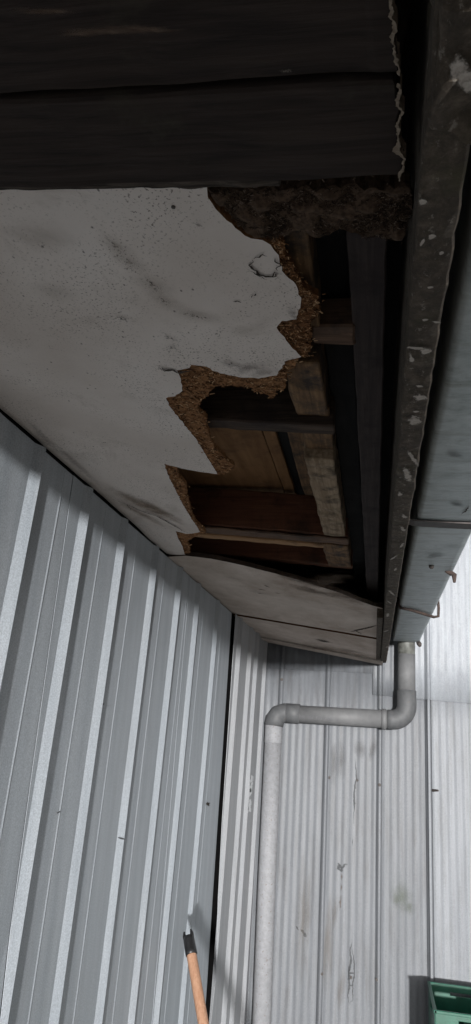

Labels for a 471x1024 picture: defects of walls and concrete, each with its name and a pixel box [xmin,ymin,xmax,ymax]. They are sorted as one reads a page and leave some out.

peeling [167,235,325,475]
peeling [166,465,207,554]
peeling [398,452,419,496]